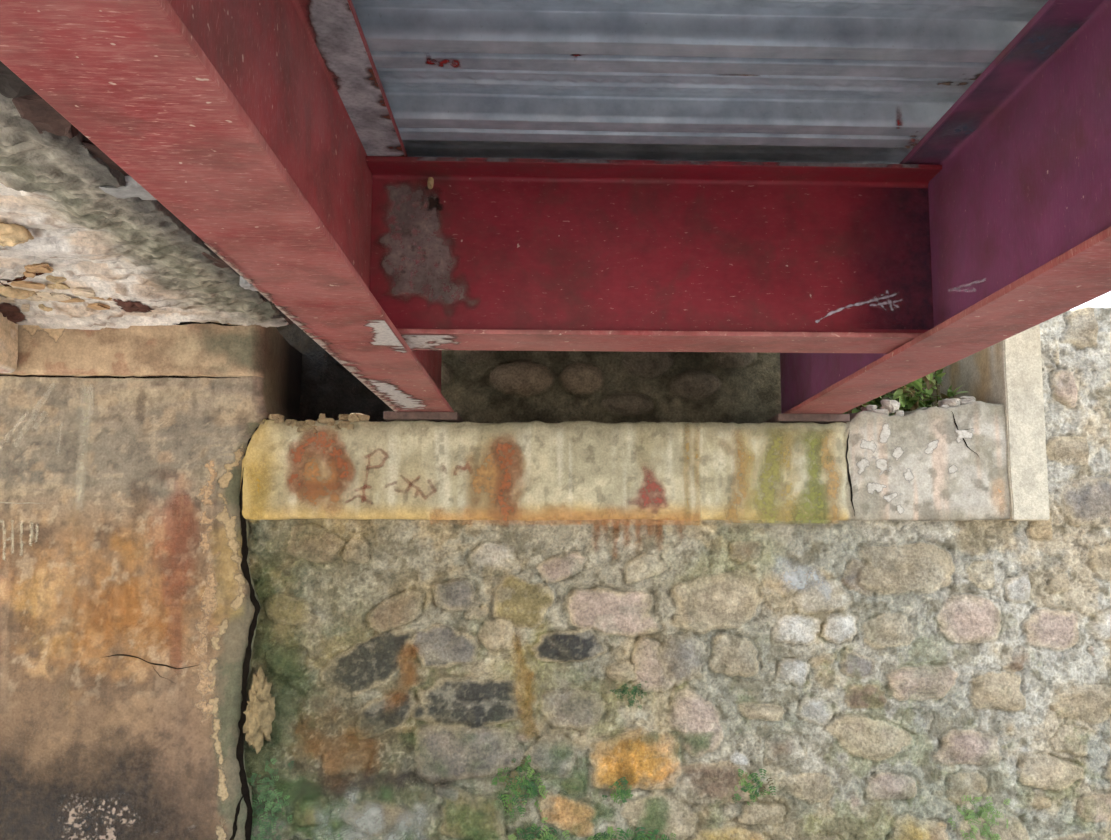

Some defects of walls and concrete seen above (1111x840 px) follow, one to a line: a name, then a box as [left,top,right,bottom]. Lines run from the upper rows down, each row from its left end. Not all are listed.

peeling [307,0,404,157]
spalling [0,61,157,200]
spalling [0,223,34,247]
peeling [377,182,478,315]
peeling [0,263,154,342]
peeling [196,235,427,412]
peeling [364,320,461,353]
corrosion [287,430,353,511]
corrosion [472,440,522,523]
peeling [196,449,250,801]
crack [107,654,200,682]
leakage [58,794,140,840]